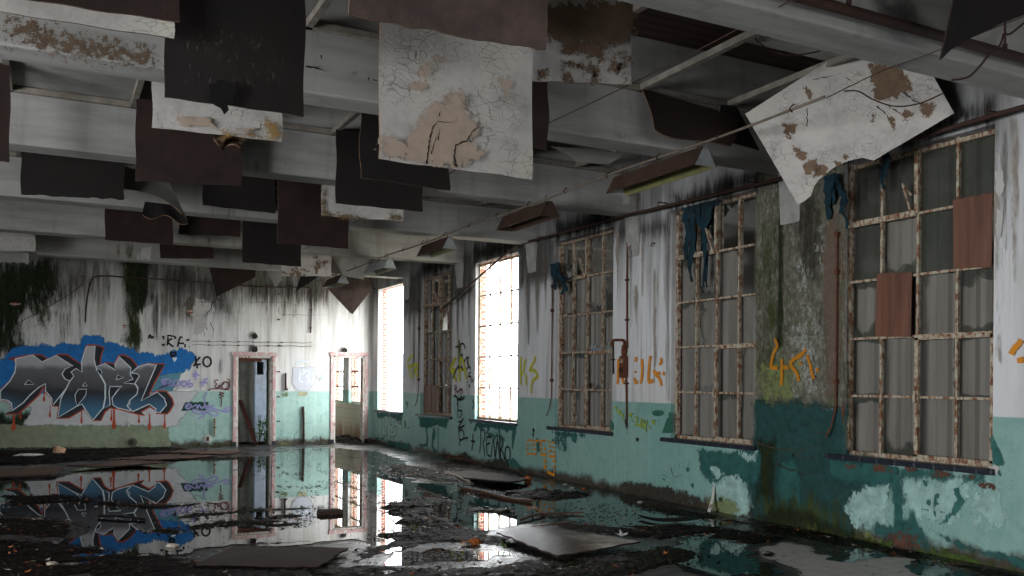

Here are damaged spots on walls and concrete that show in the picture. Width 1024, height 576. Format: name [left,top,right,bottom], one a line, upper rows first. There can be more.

peeling [537,0,642,86]
peeling [374,86,489,170]
crack [426,110,480,167]
crack [876,92,920,127]
peeling [869,62,937,131]
water stain [993,121,1018,264]
water stain [0,258,109,357]
water stain [117,246,229,333]
water stain [698,162,1024,576]
peeling [709,466,754,517]
peeling [738,450,757,463]
peeling [843,463,1014,543]